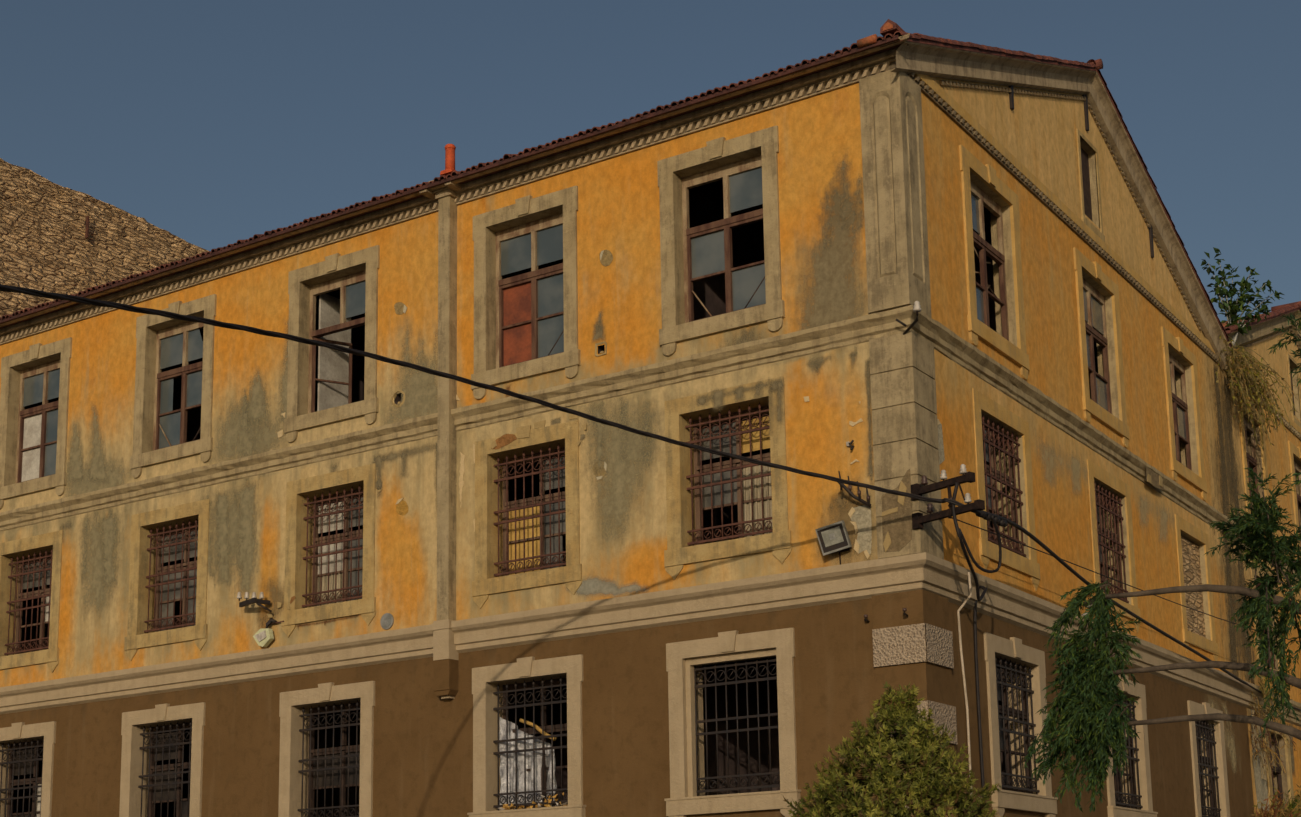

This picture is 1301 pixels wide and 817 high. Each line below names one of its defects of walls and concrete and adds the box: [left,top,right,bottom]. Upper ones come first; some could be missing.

damp [801,161,864,330]
damp [68,410,124,497]
damp [208,487,255,592]
damp [218,322,289,458]
damp [592,403,655,534]
spalling [848,469,913,559]